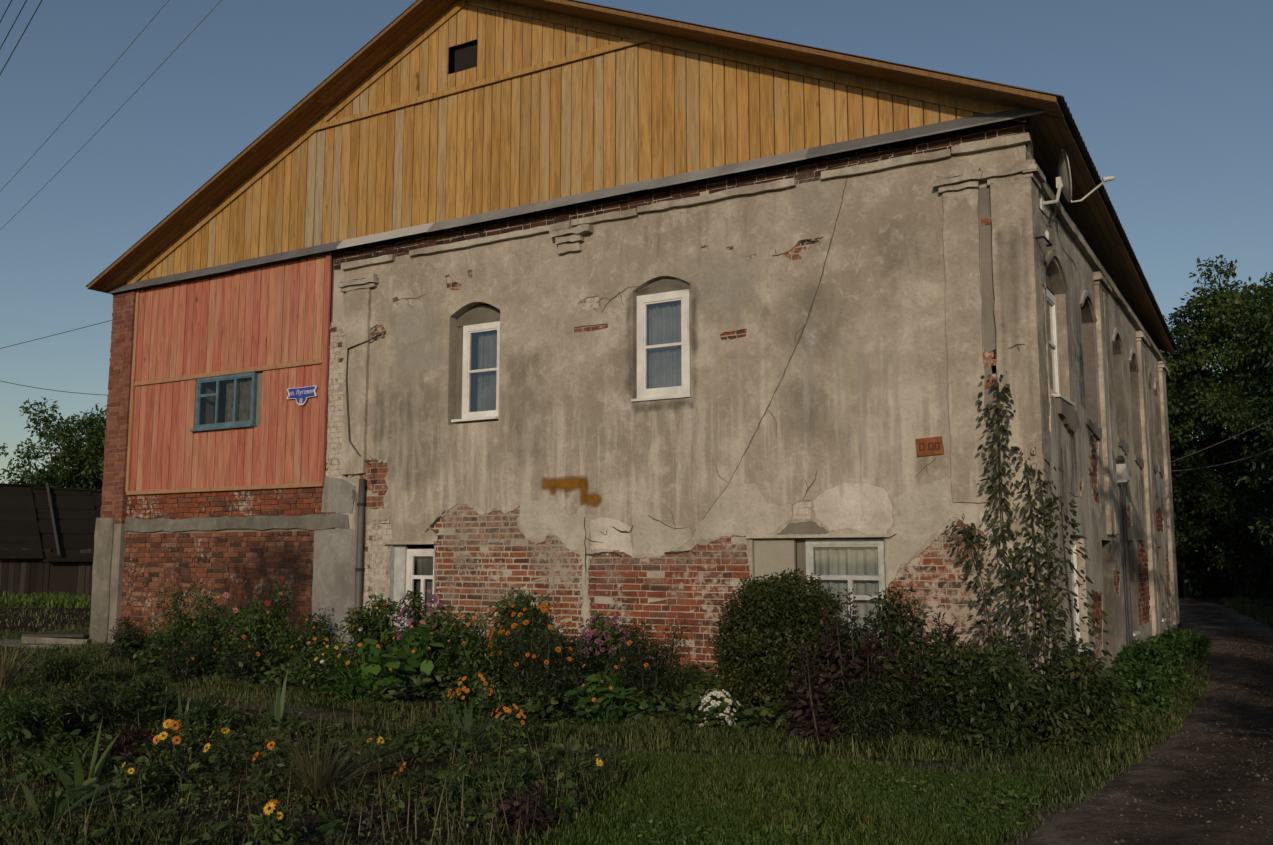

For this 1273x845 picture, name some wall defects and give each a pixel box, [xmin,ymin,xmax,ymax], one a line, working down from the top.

spalling [782,239,818,261]
spalling [575,296,608,333]
spalling [721,329,747,341]
crack [584,177,847,583]
spalling [325,318,392,619]
spalling [1080,433,1099,504]
spalling [1156,508,1164,532]
spalling [429,504,751,685]
spalling [887,520,999,664]
spalling [1091,568,1120,661]
spalling [1138,539,1150,625]